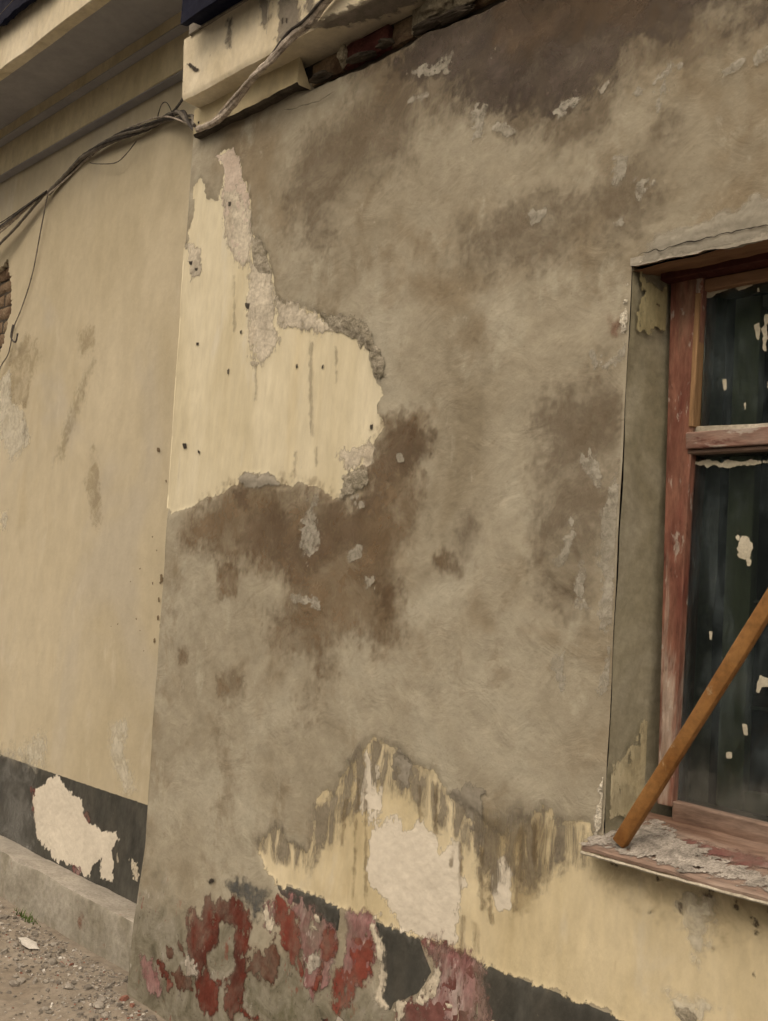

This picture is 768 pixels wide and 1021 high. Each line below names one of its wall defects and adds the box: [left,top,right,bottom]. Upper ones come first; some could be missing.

damp [260,0,418,42]
spalling [307,0,505,89]
damp [286,0,708,237]
spalling [0,262,12,352]
peeling [157,146,386,515]
peeling [613,261,667,335]
damp [181,414,425,677]
peeling [30,774,120,882]
peeling [131,859,139,882]
peeling [140,719,768,1021]